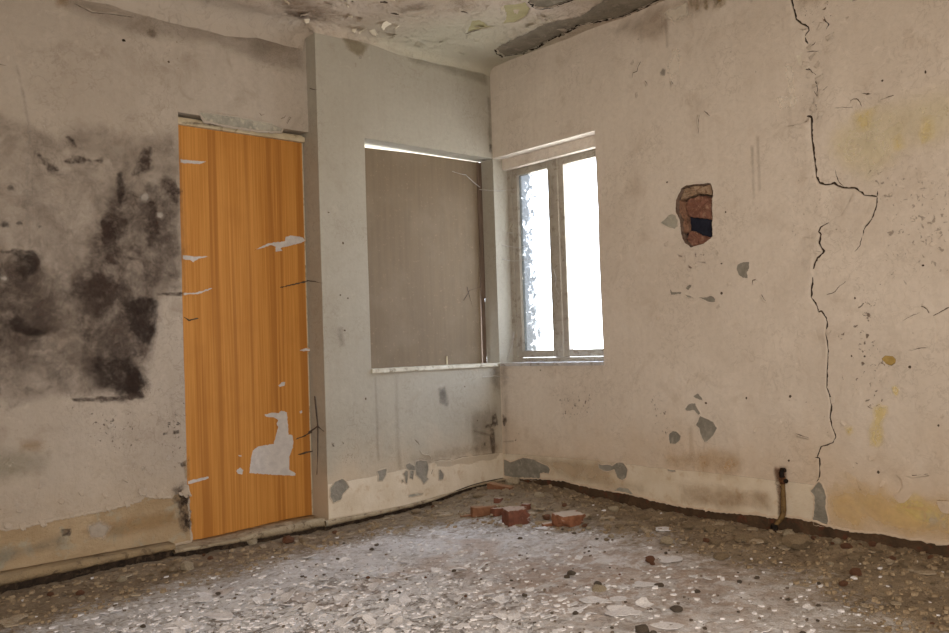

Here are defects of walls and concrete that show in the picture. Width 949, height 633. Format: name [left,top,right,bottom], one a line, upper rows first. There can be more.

crack [494,0,659,58]
spalling [491,0,665,57]
water stain [140,150,150,171]
spalling [660,180,726,264]
crack [760,0,894,481]
water stain [0,250,55,345]
water stain [72,175,182,401]
peeling [684,392,718,444]
peeling [0,485,193,571]
peeling [329,478,350,504]
peeling [401,459,445,498]
flaking render [503,457,949,565]